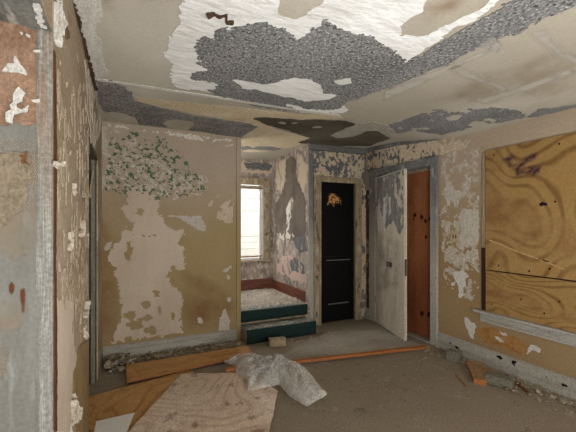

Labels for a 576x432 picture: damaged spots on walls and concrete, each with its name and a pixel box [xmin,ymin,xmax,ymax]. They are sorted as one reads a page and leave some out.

peeling [0,3,47,126]
spalling [189,0,576,112]
rust [9,283,25,311]
peeling [52,59,576,432]